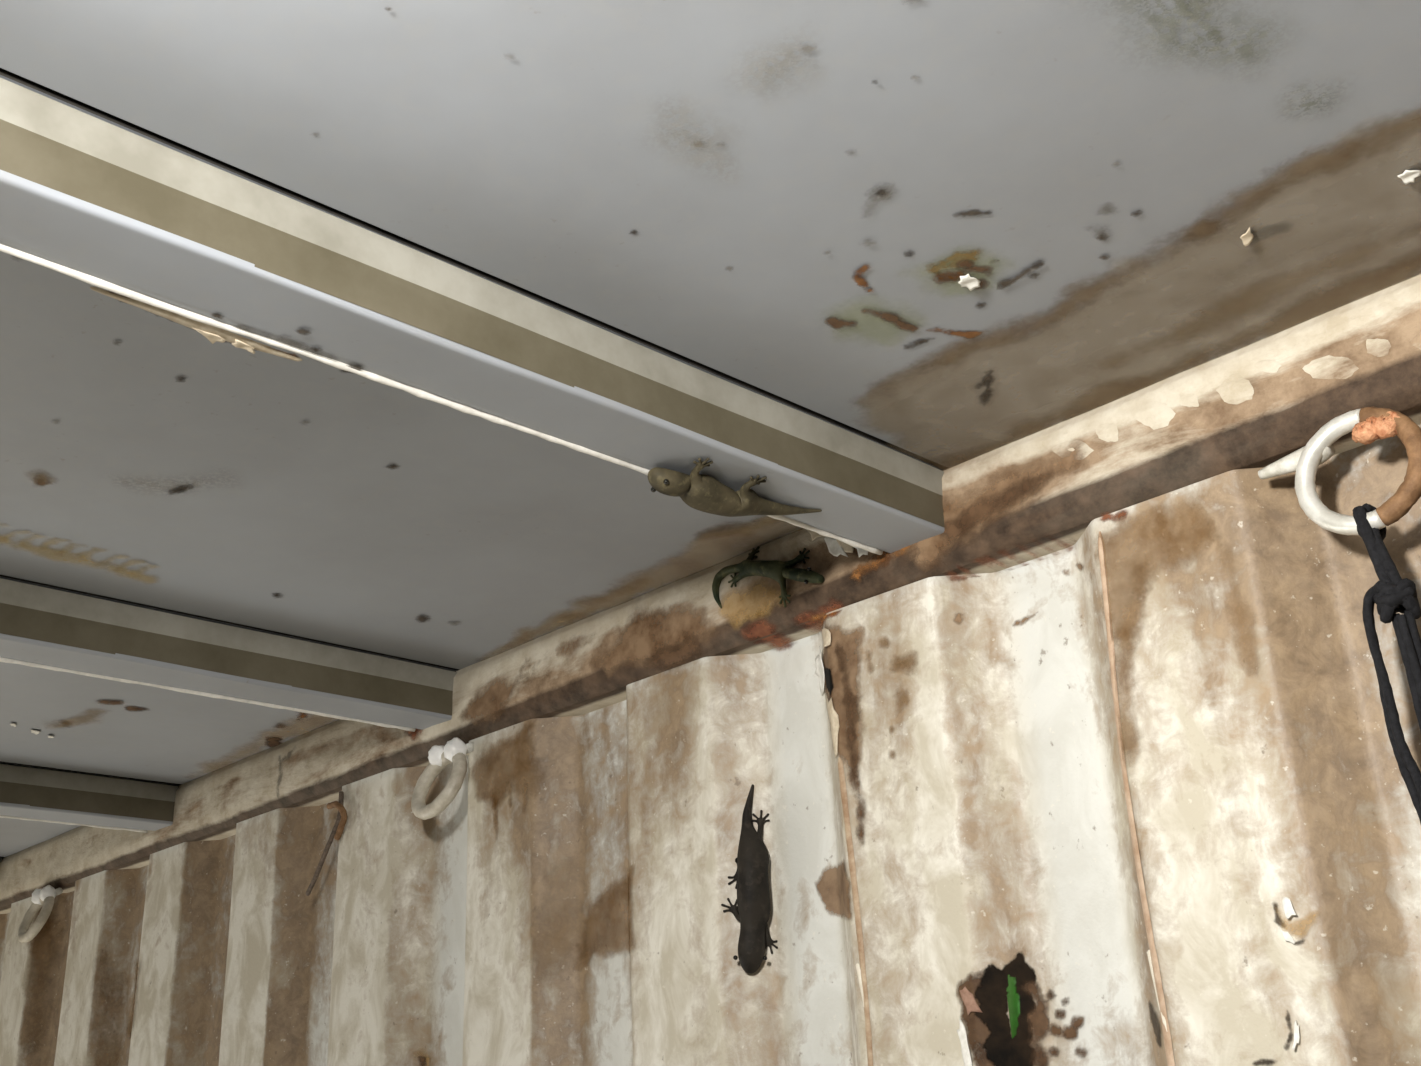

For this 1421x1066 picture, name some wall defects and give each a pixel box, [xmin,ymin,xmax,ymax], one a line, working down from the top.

peeling [90,286,321,361]
damp [924,256,1421,470]
rust [559,638,580,654]
rust [896,655,915,668]
rust [462,679,514,722]
rust [593,584,888,840]
peeling [957,987,983,1066]